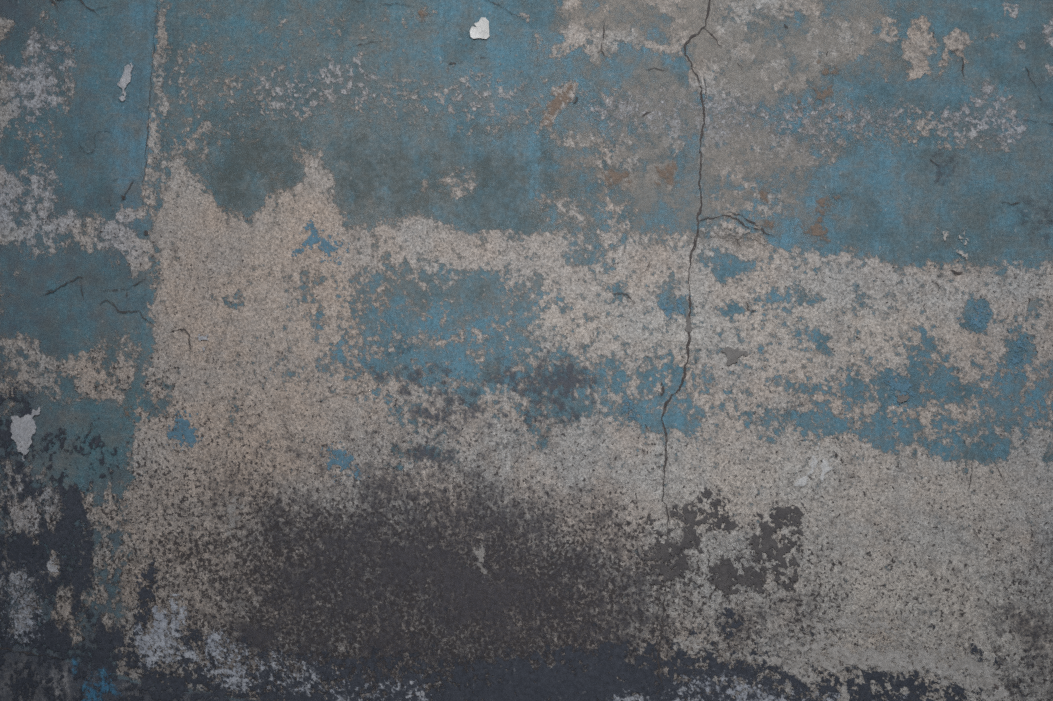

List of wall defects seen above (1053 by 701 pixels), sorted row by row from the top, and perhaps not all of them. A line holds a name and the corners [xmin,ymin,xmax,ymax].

peeling [0,17,16,42]
flaking render [470,17,490,39]
peeling [938,27,976,76]
peeling [1042,18,1053,47]
flaking render [117,63,134,101]
peeling [211,51,527,135]
peeling [420,166,478,200]
crack [645,0,775,686]
leakage [495,360,596,422]
leakage [0,375,1053,701]